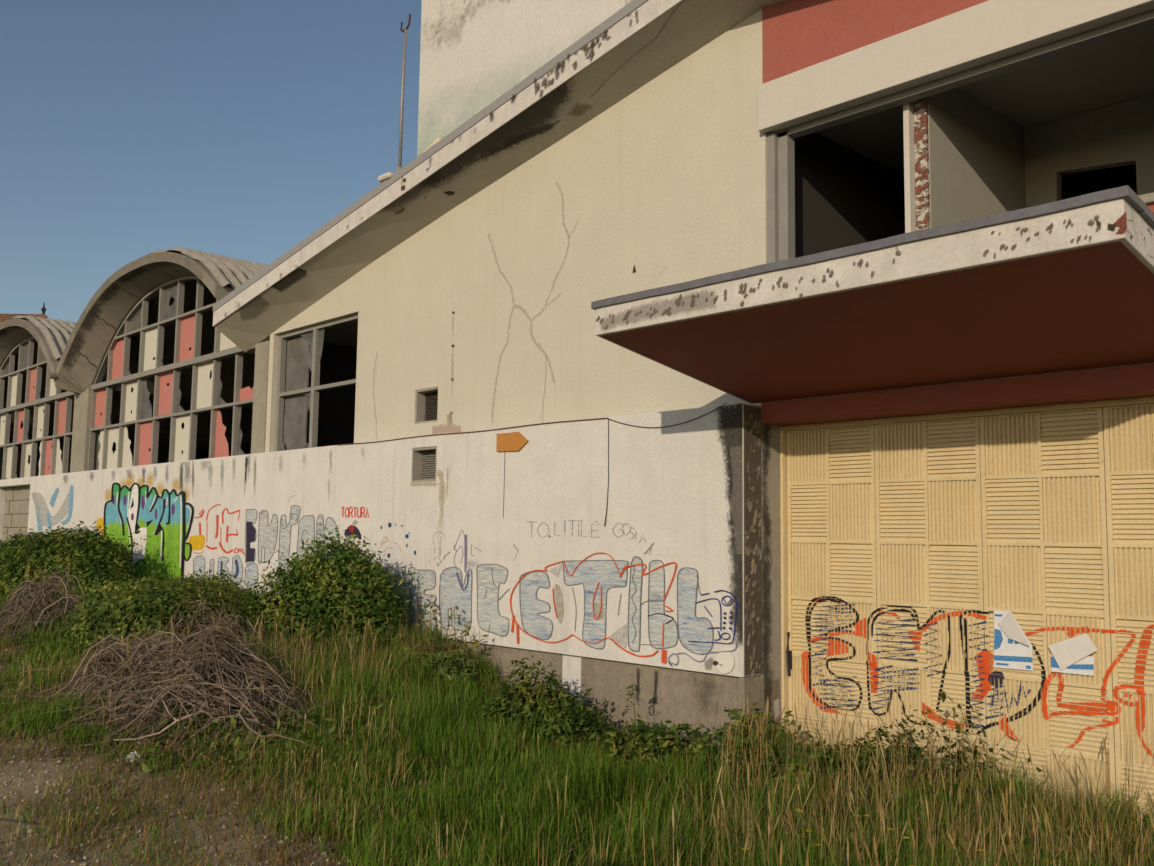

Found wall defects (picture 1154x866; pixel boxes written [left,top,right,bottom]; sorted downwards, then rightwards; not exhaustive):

leakage [384,26,612,209]
spalling [914,101,930,231]
peeling [596,268,839,329]
peeling [983,212,1152,258]
leakage [717,404,772,721]